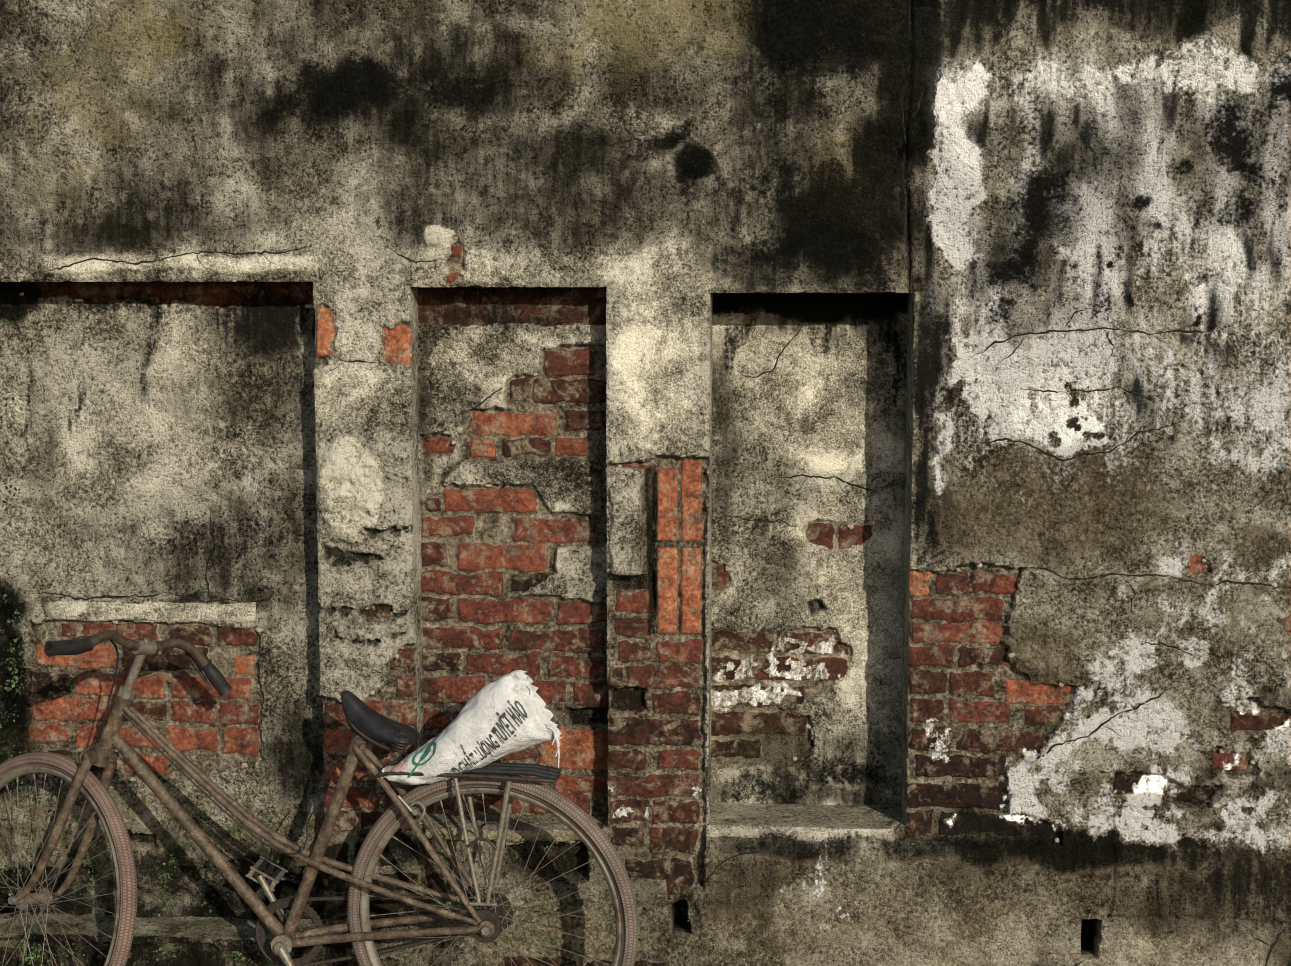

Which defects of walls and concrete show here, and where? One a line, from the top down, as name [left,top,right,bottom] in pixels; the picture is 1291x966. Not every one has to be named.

leakage [265,54,528,135]
leakage [753,0,1291,234]
crack [45,246,312,273]
leakage [979,167,1098,334]
leakage [714,159,956,582]
crack [972,308,1213,494]
spalling [15,619,264,785]
spalling [322,342,853,891]
spalling [801,517,874,553]
spalling [893,536,1291,855]
crack [1025,567,1291,764]
crack [1249,926,1287,966]